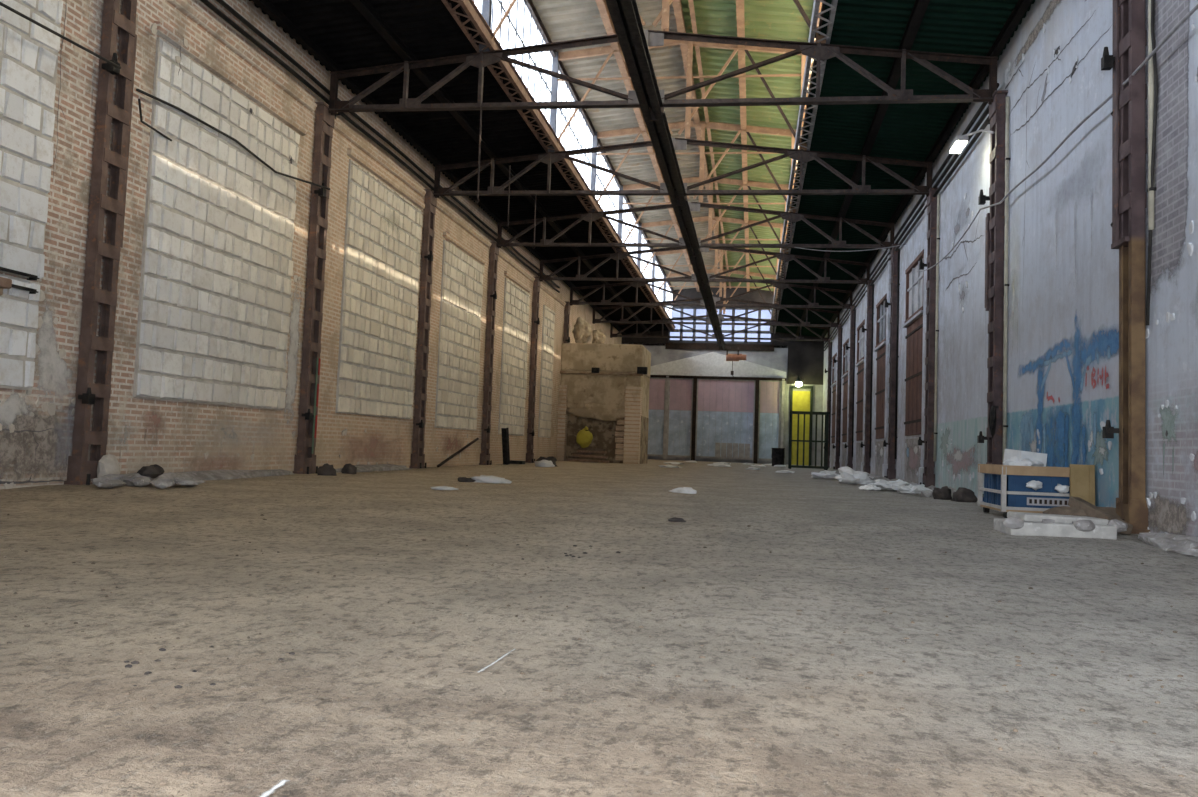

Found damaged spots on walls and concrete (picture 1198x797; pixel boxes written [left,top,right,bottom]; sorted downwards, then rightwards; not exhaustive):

flaking render [0,289,76,489]
flaking render [1146,492,1196,535]